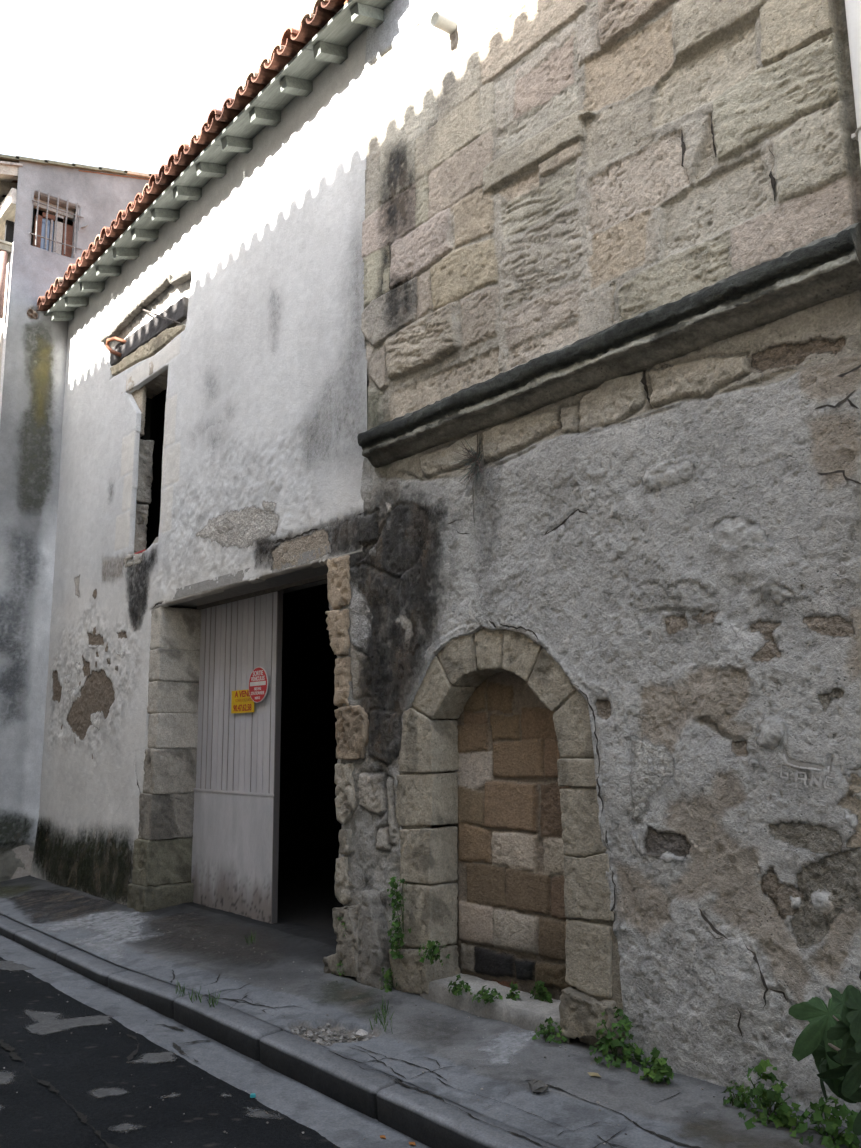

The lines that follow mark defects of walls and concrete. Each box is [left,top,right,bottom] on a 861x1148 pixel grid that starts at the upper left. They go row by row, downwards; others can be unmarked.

water stain [381,145,413,238]
water stain [378,249,414,327]
water stain [19,324,53,509]
water stain [103,549,156,627]
peeling [196,501,331,573]
water stain [308,491,441,773]
peeling [52,627,127,743]
water stain [0,814,134,904]
spalling [630,827,699,862]
spalling [761,767,861,949]
crack [698,908,788,1037]
crack [330,1045,701,1148]